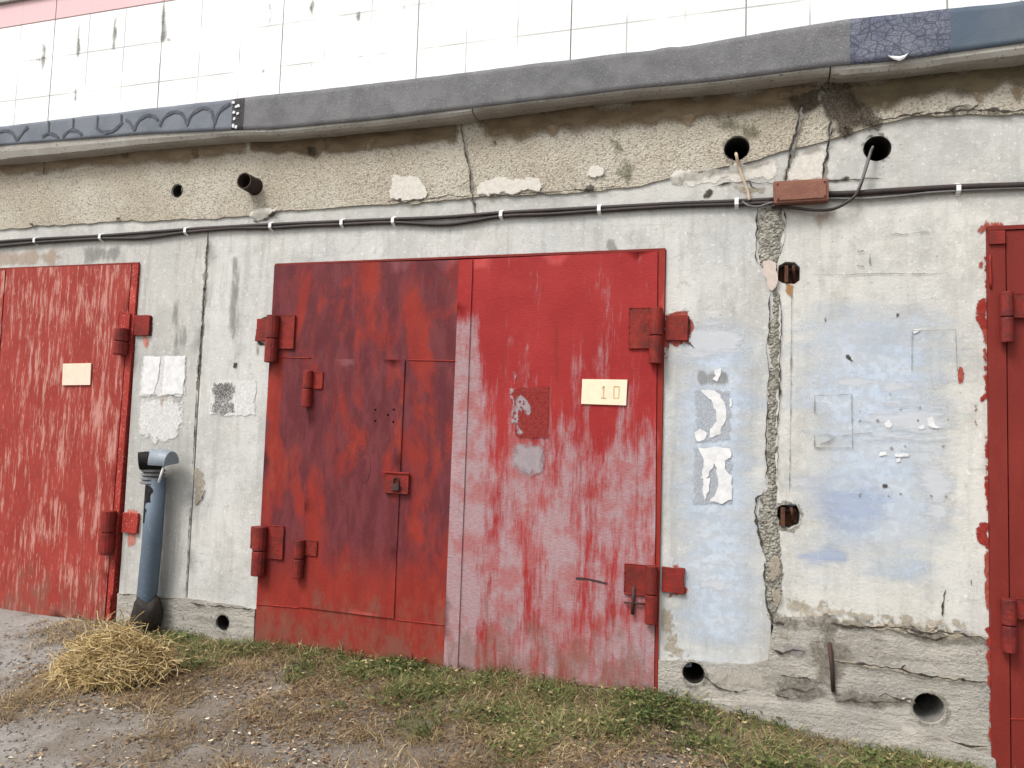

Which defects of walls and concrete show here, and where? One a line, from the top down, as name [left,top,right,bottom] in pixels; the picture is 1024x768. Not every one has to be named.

peeling [389,174,427,202]
peeling [477,177,543,197]
crack [430,124,624,213]
damp [479,65,1024,139]
crack [717,97,881,189]
crack [862,104,1024,128]
crack [786,293,794,493]
crack [703,675,747,693]
crack [771,648,810,700]
spalling [681,613,986,726]
crack [820,590,987,683]
crack [940,737,987,749]